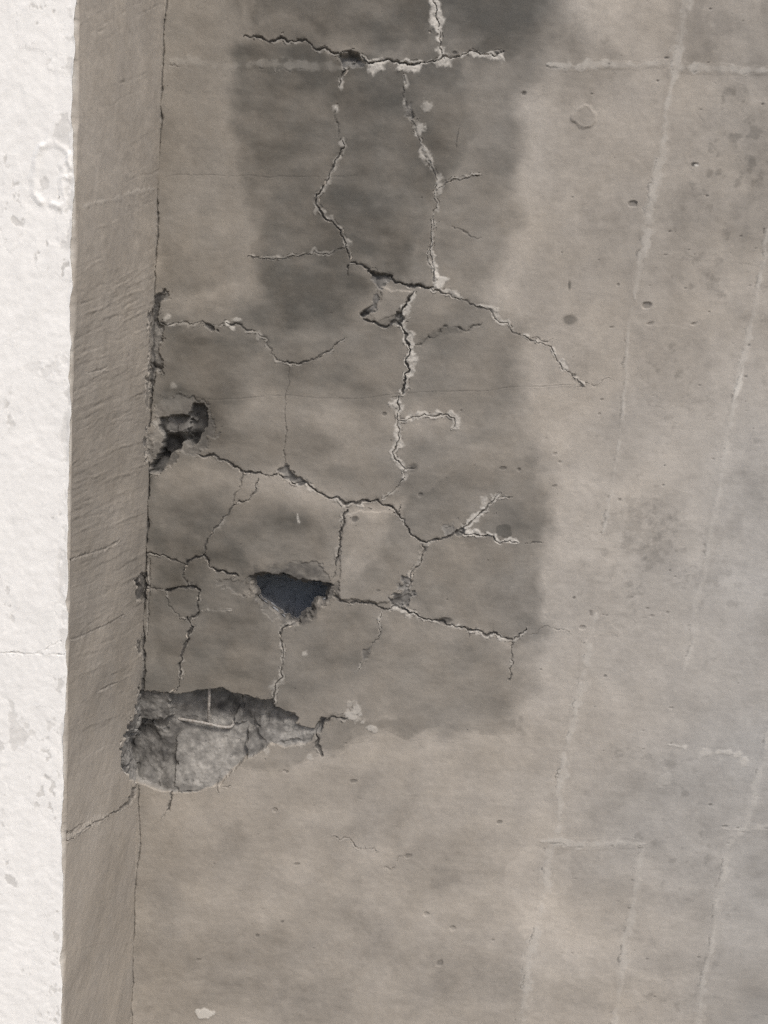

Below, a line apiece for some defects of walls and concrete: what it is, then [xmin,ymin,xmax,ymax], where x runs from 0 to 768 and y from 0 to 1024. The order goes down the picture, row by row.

hole [141,382,223,476]
damp [140,0,597,773]
crack [132,0,617,760]
hole [249,559,338,629]
spalling [118,682,329,795]
crack [67,783,175,1024]